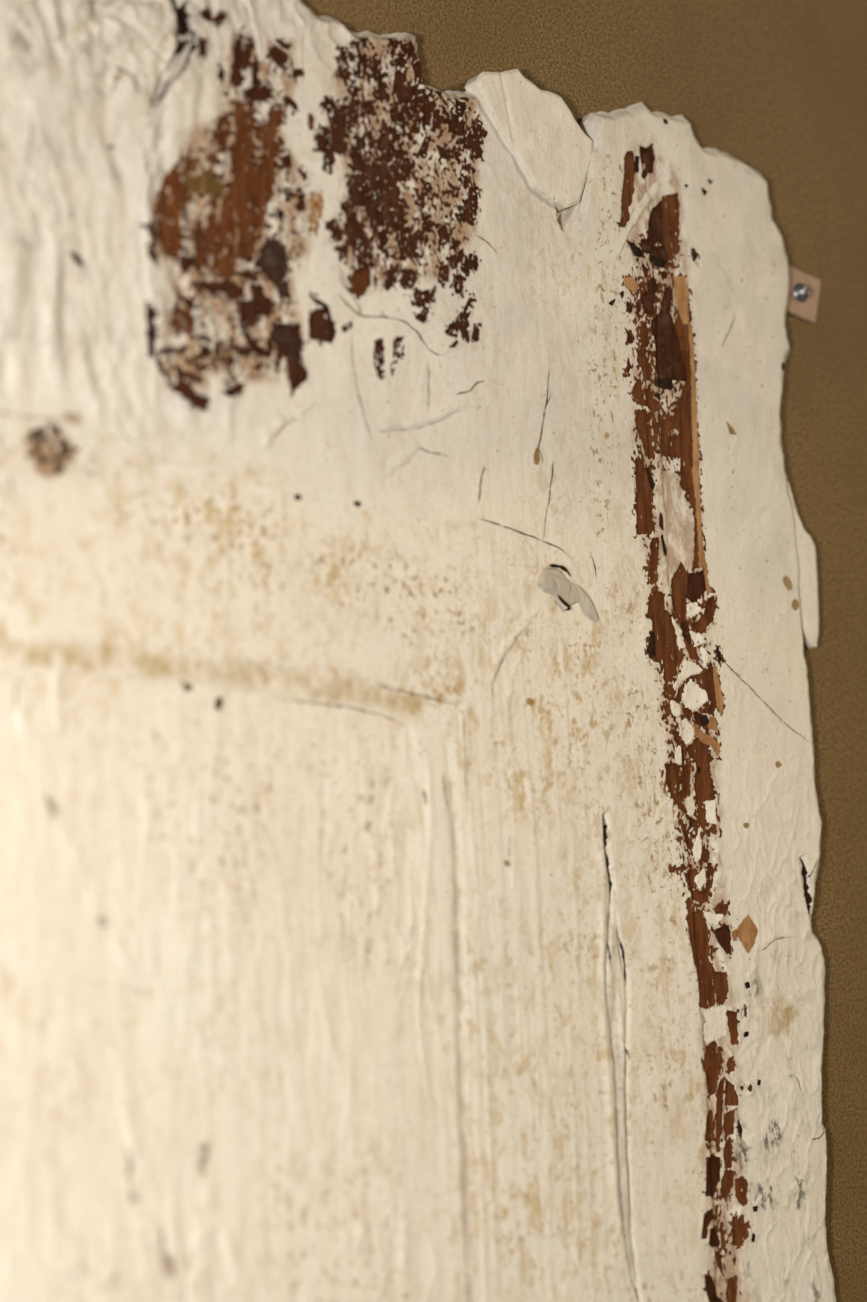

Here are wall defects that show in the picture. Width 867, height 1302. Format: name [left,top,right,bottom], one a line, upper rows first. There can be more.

peeling [140,3,488,414]
crack [602,813,626,983]
peeling [609,143,761,1302]
crack [800,857,819,913]